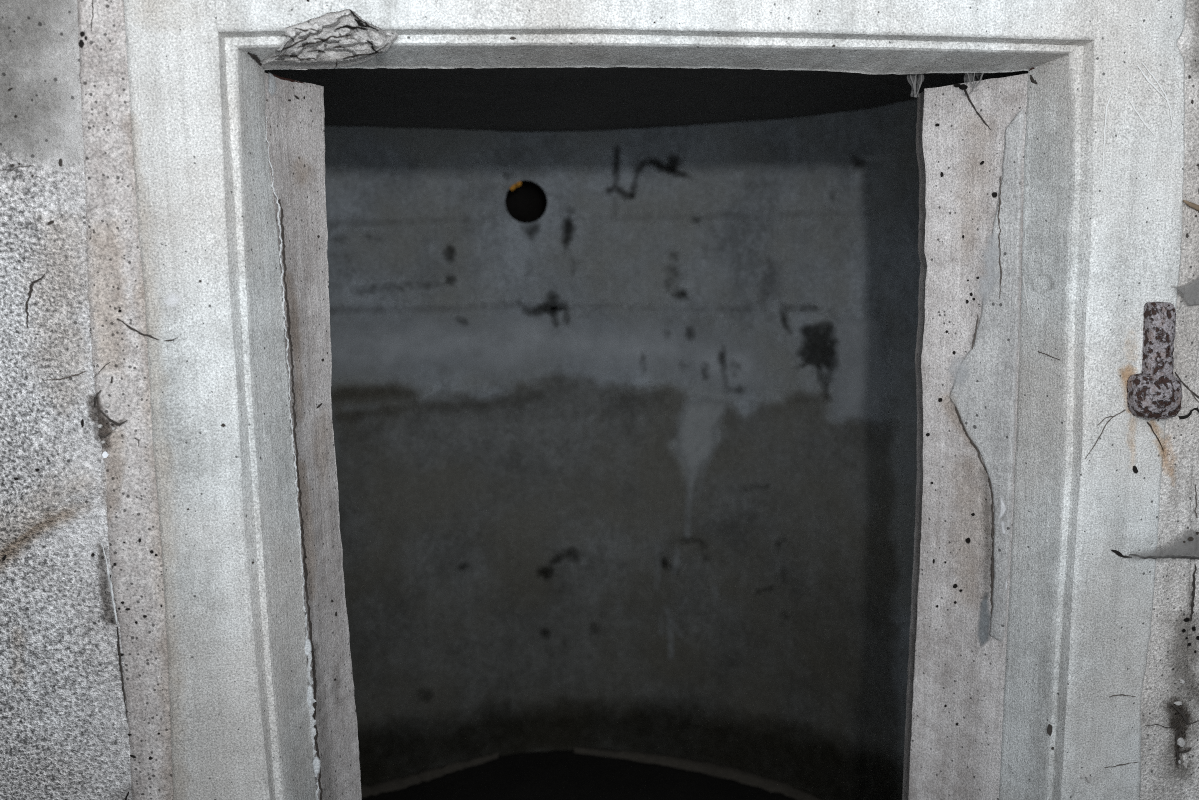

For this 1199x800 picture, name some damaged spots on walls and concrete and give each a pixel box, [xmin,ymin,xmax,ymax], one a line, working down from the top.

spalling [259,9,399,70]
crack [25,274,45,328]
crack [116,309,178,341]
spalling [81,362,127,447]
water stain [801,319,883,419]
crack [1085,372,1199,459]
water stain [678,399,726,537]